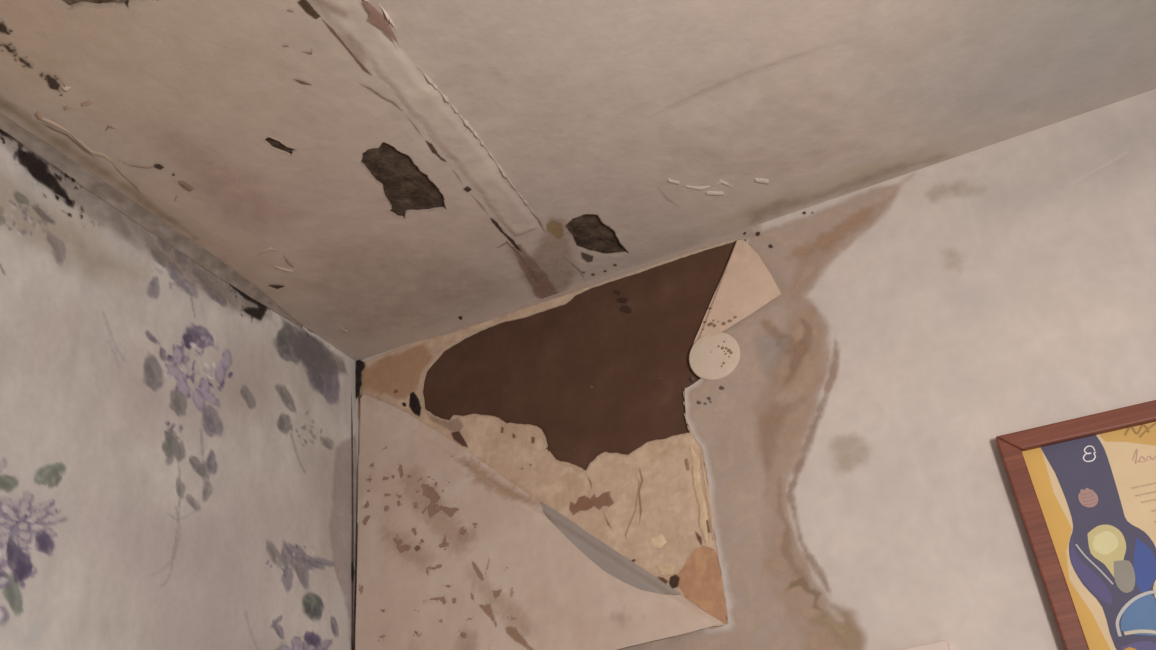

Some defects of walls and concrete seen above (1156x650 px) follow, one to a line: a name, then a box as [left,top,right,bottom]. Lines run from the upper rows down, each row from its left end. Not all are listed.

spalling [52,0,159,10]
spalling [0,23,93,110]
spalling [360,142,447,220]
damp [0,129,269,320]
damp [501,216,617,298]
spalling [564,214,629,262]
flaking render [364,238,747,497]
damp [618,187,897,650]
damp [471,590,533,650]